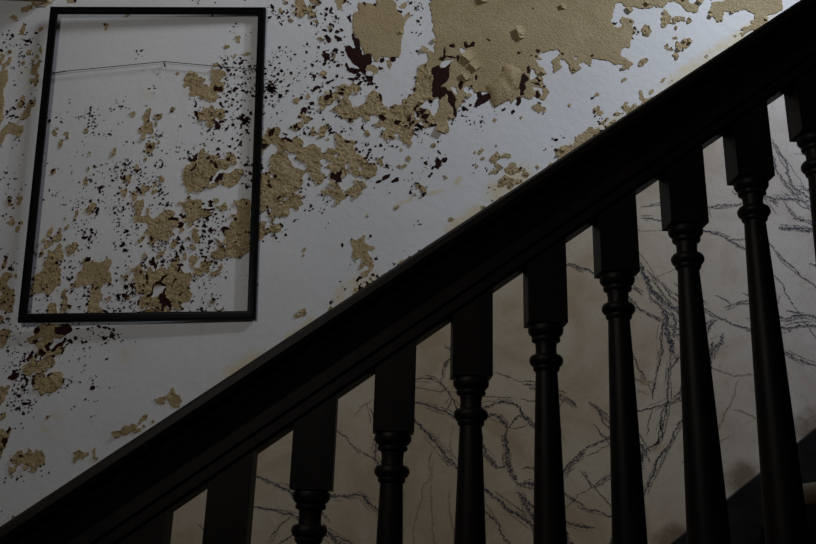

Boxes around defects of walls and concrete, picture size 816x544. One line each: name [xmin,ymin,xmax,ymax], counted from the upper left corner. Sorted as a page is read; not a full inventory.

peeling [0,0,54,149]
peeling [0,165,27,233]
peeling [28,0,783,313]
peeling [0,248,124,483]
peeling [111,414,155,438]
peeling [154,388,182,408]